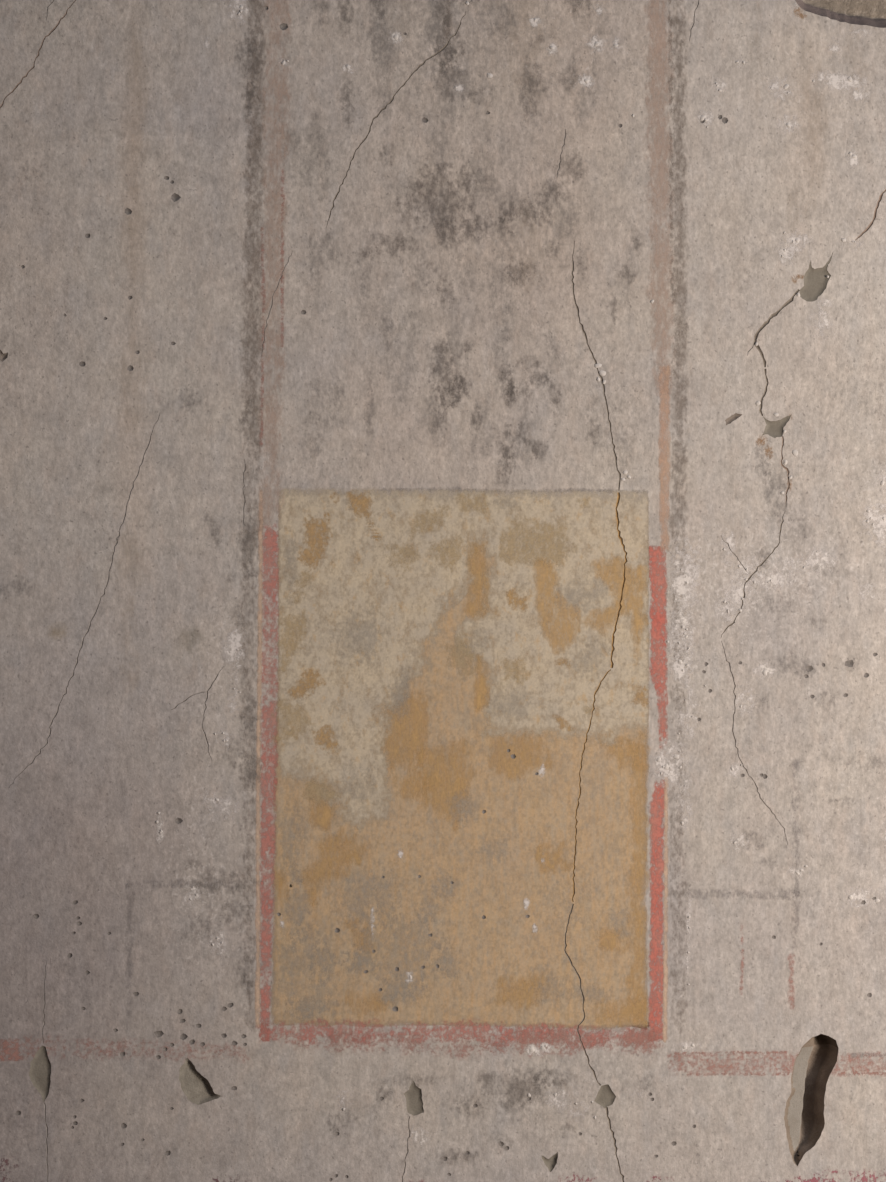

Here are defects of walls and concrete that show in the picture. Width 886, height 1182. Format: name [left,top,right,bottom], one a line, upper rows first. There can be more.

crack [0,0,76,108]
crack [326,0,472,228]
crack [557,129,566,176]
flaking render [698,111,728,128]
flaking render [812,72,867,100]
flaking render [795,0,886,33]
crack [842,189,886,242]
crack [261,254,292,356]
crack [721,289,800,845]
flaking render [863,504,886,548]
crack [564,241,631,1182]
hole [784,1034,838,1166]